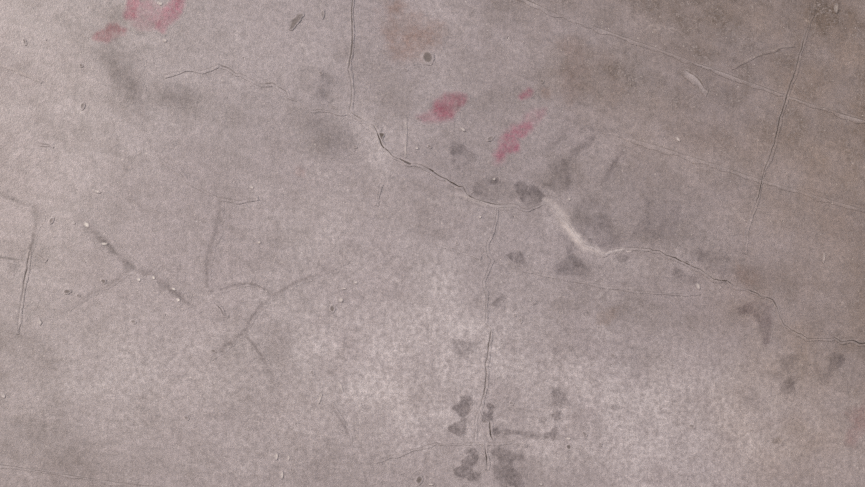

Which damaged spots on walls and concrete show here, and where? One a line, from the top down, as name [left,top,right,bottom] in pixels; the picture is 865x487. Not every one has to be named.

crack [0,187,48,334]
crack [56,200,350,389]
crack [163,0,865,470]
water stain [446,384,571,487]